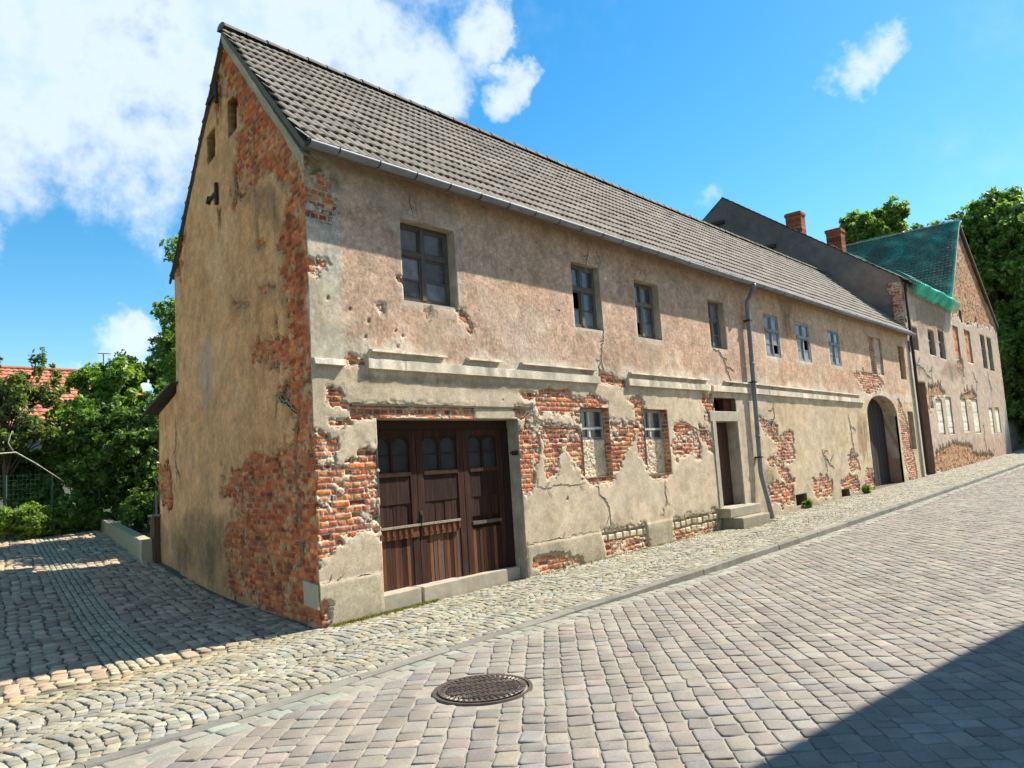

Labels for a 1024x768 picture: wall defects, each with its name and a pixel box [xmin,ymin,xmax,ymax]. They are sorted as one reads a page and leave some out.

spalling [214,49,474,629]
crack [597,328,606,377]
crack [275,379,300,448]
spalling [514,373,714,494]
spalling [759,417,795,508]
spalling [812,449,876,499]
spalling [897,399,918,481]
spalling [935,443,993,472]
spalling [532,553,582,574]
crack [525,482,616,561]
flaking render [601,522,649,556]